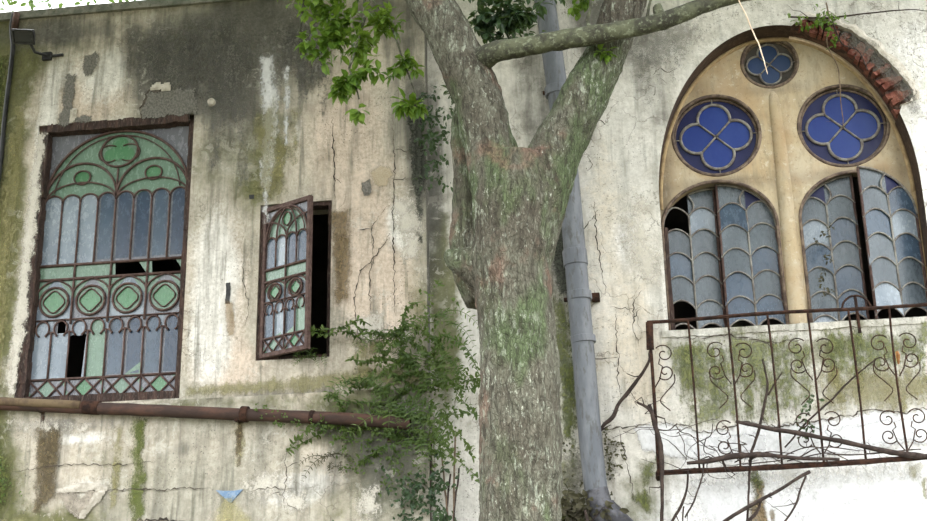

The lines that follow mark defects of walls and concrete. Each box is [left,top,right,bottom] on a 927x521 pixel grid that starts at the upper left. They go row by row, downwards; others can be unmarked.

flaking render [140,82,198,119]
leakage [130,19,327,219]
flaking render [789,11,920,122]
crack [353,128,410,339]
crack [584,202,642,392]
leakage [33,426,60,512]
flaking render [56,483,107,519]